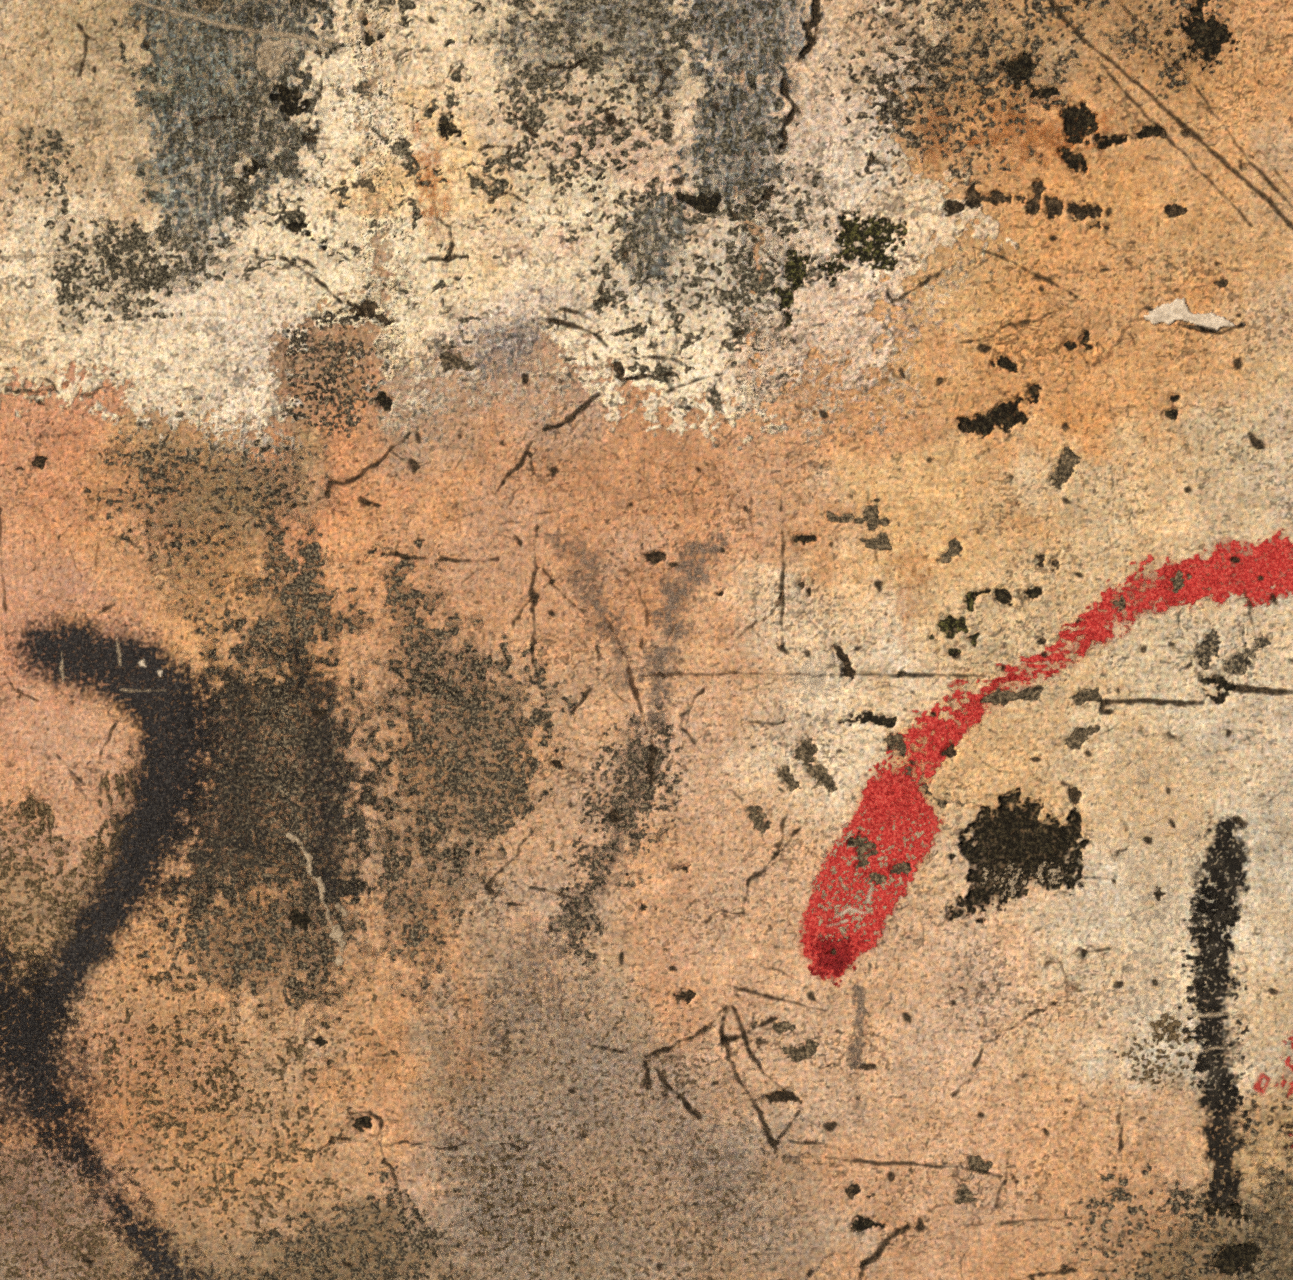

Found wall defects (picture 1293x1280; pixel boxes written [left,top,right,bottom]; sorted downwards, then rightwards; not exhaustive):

crack [960,247,1076,343]
peeling [1144,298,1245,334]
crack [600,1006,800,1151]
crack [1028,1268,1076,1280]